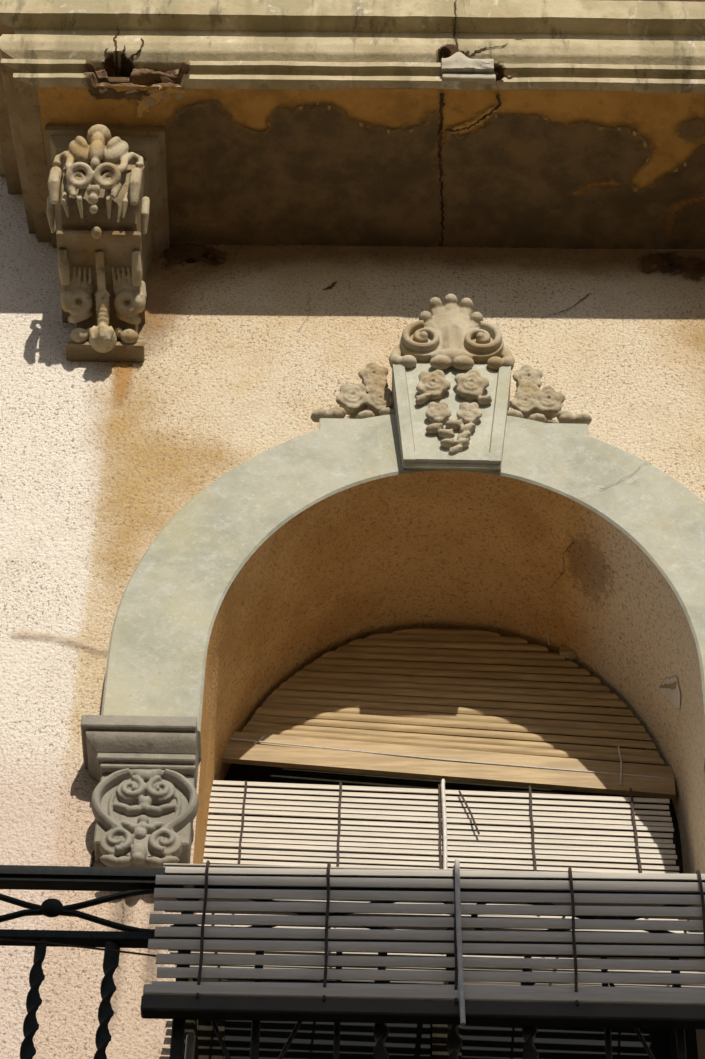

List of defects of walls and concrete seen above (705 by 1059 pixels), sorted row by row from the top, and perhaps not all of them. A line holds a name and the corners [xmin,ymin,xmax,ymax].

crack [453,0,522,64]
peeling [84,24,705,281]
crack [437,93,502,247]
damp [138,244,705,339]